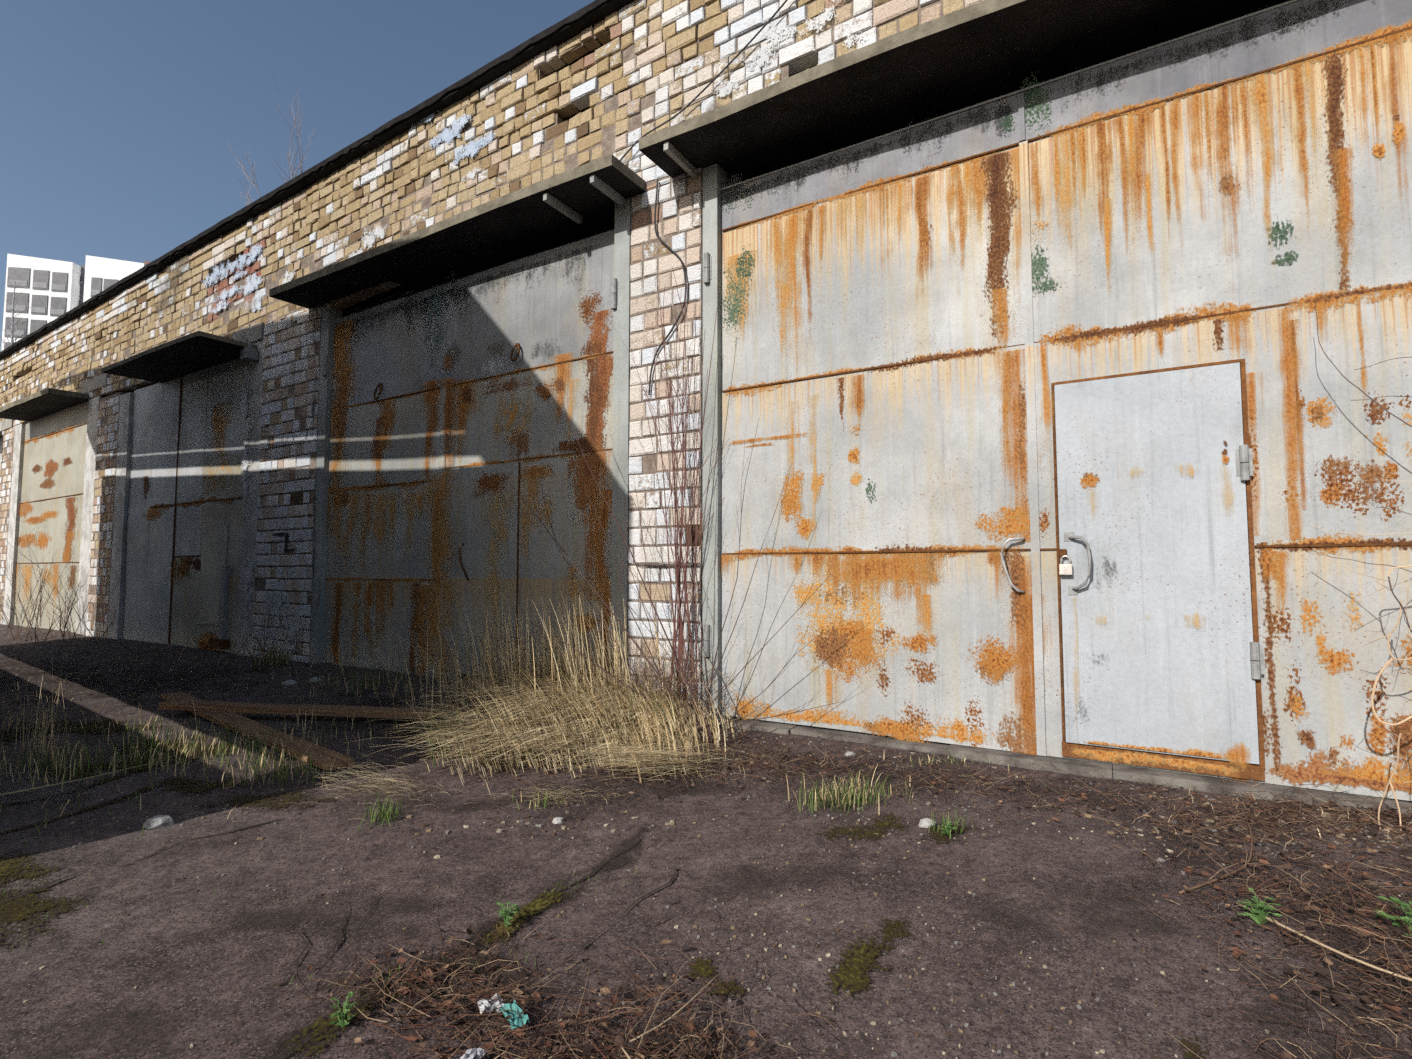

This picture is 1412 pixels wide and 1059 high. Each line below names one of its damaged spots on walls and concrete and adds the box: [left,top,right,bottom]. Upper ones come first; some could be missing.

corrosion [325,290,613,678]
corrosion [721,21,1412,795]